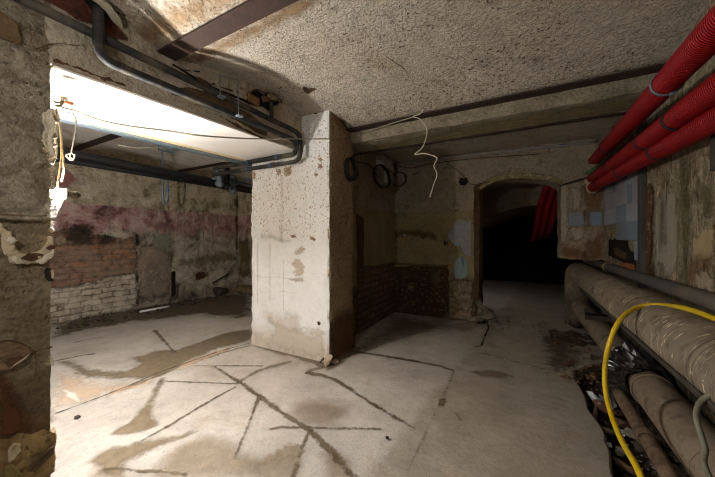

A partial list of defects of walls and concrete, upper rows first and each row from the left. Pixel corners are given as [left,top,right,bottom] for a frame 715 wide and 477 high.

flaking render [0,223,138,324]
water stain [63,224,116,246]
spalling [357,173,586,333]
spalling [609,238,635,271]
crack [30,337,100,379]
water stain [60,330,251,434]
crack [55,330,410,477]
crack [350,350,454,371]
crack [476,309,562,375]
spalling [0,428,57,477]